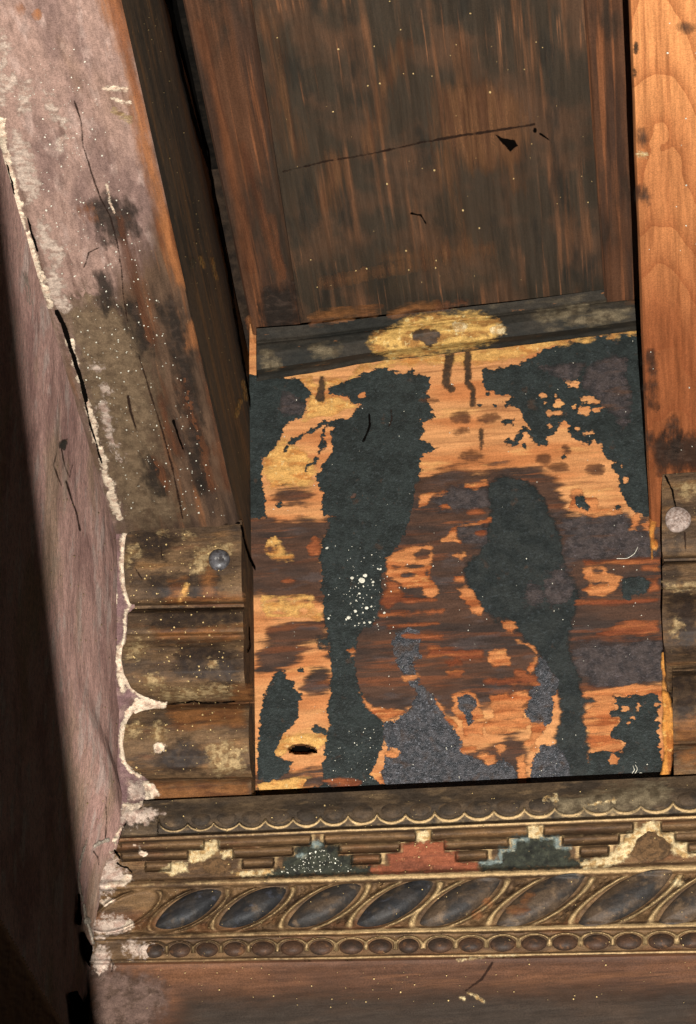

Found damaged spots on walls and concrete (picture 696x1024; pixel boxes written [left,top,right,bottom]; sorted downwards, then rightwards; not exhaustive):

crack [74,101,128,321]
crack [282,123,535,172]
water stain [0,0,336,1024]
peeling [249,331,665,793]
water stain [353,351,696,720]
water stain [466,732,530,782]
water stain [635,668,696,740]
spalling [76,838,110,967]
spalling [68,991,90,1024]